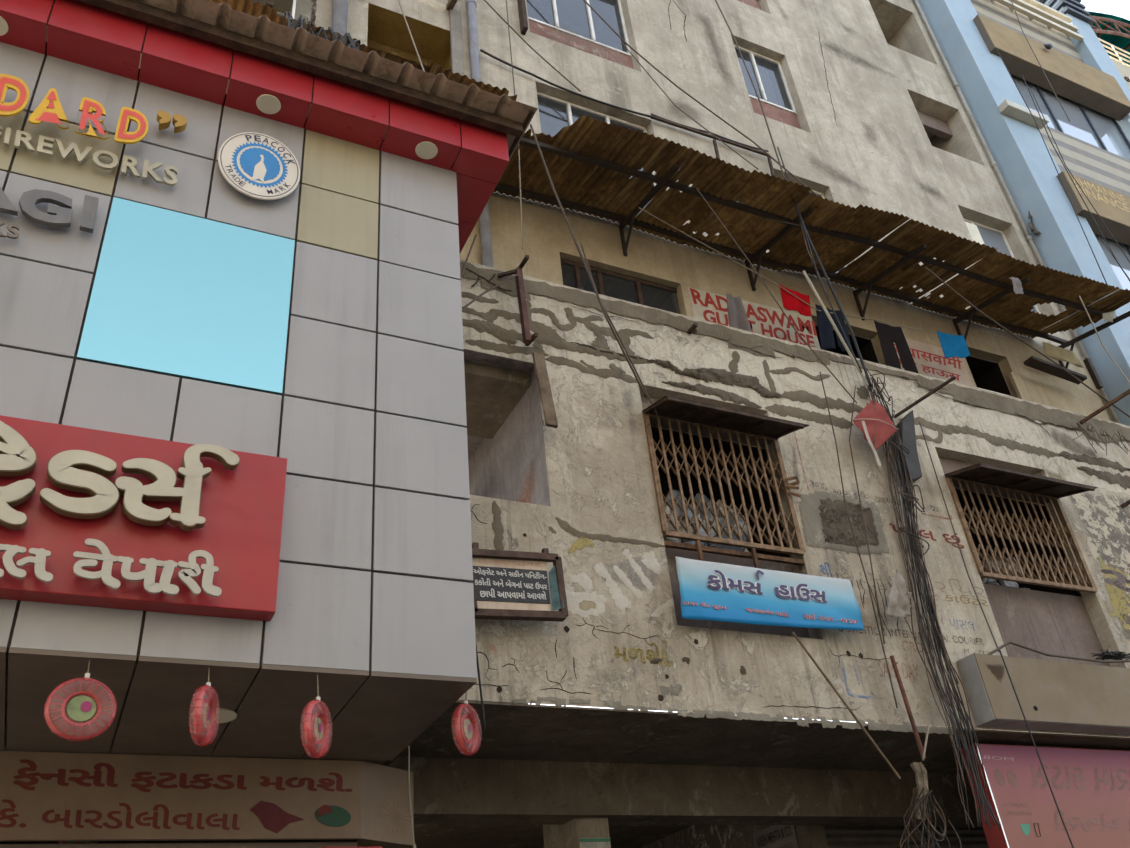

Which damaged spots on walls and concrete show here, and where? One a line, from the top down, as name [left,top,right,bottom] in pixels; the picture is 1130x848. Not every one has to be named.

spalling [656,359,782,398]
peeling [1071,488,1130,637]
crack [474,617,657,694]